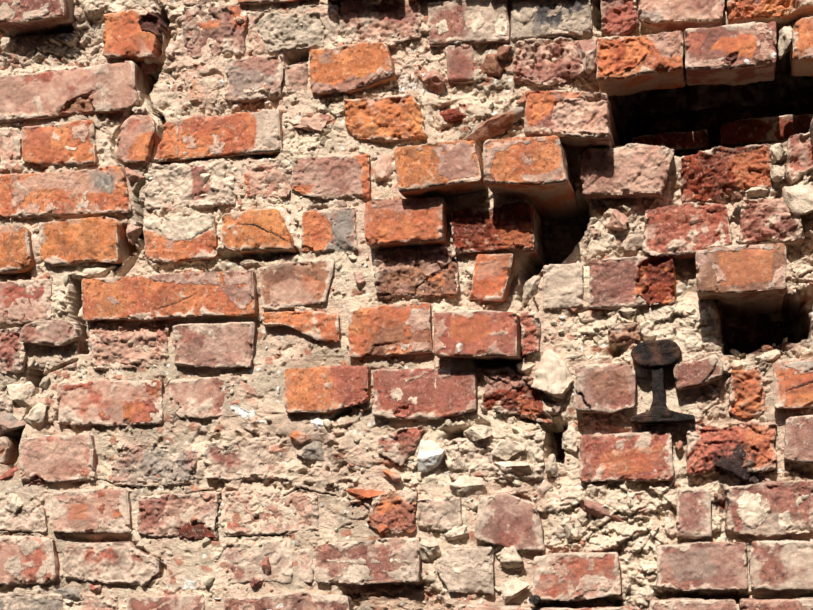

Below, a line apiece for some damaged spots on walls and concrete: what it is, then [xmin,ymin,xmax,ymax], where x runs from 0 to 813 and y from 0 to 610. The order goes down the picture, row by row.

spalling [344,93,813,253]
peeling [712,262,726,282]
peeling [768,266,786,288]
hole [726,321,795,355]
corrosion [704,444,760,528]